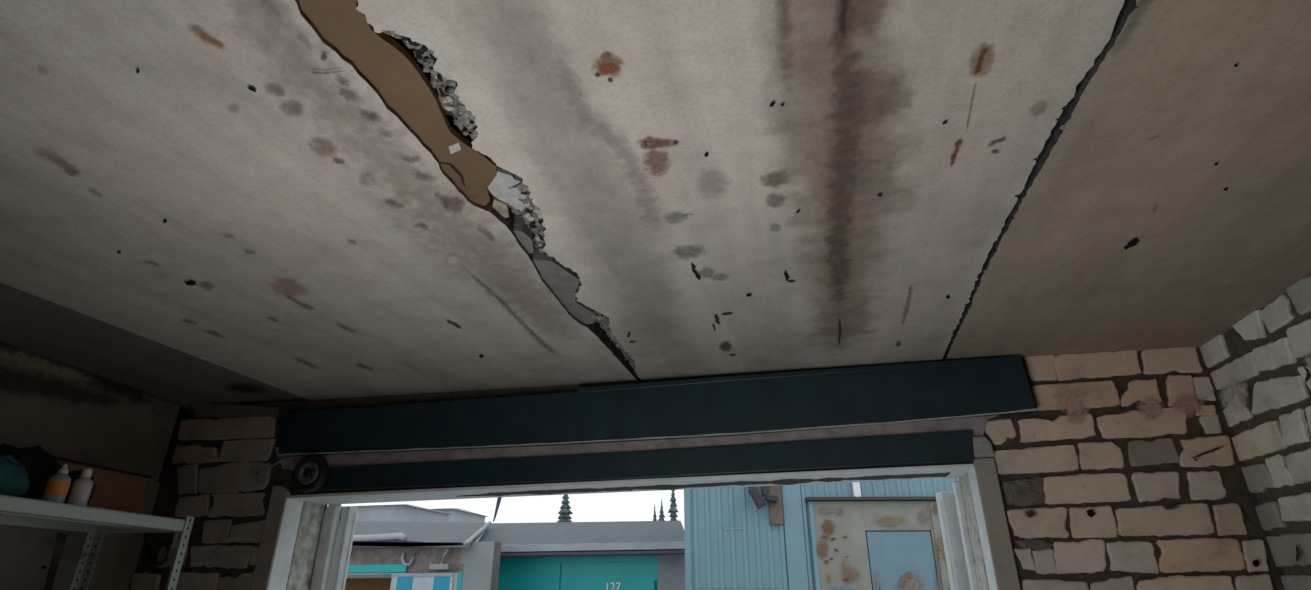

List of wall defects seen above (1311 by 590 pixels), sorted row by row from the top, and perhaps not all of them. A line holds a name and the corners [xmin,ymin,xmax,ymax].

rust [192,28,223,49]
spalling [380,30,478,139]
rust [595,53,622,83]
rust [972,47,991,75]
crack [1056,104,1069,130]
spalling [508,183,550,257]
water stain [765,173,786,207]
water stain [798,0,877,344]
crack [943,193,1022,358]
water stain [0,341,143,405]
spalling [594,311,640,378]